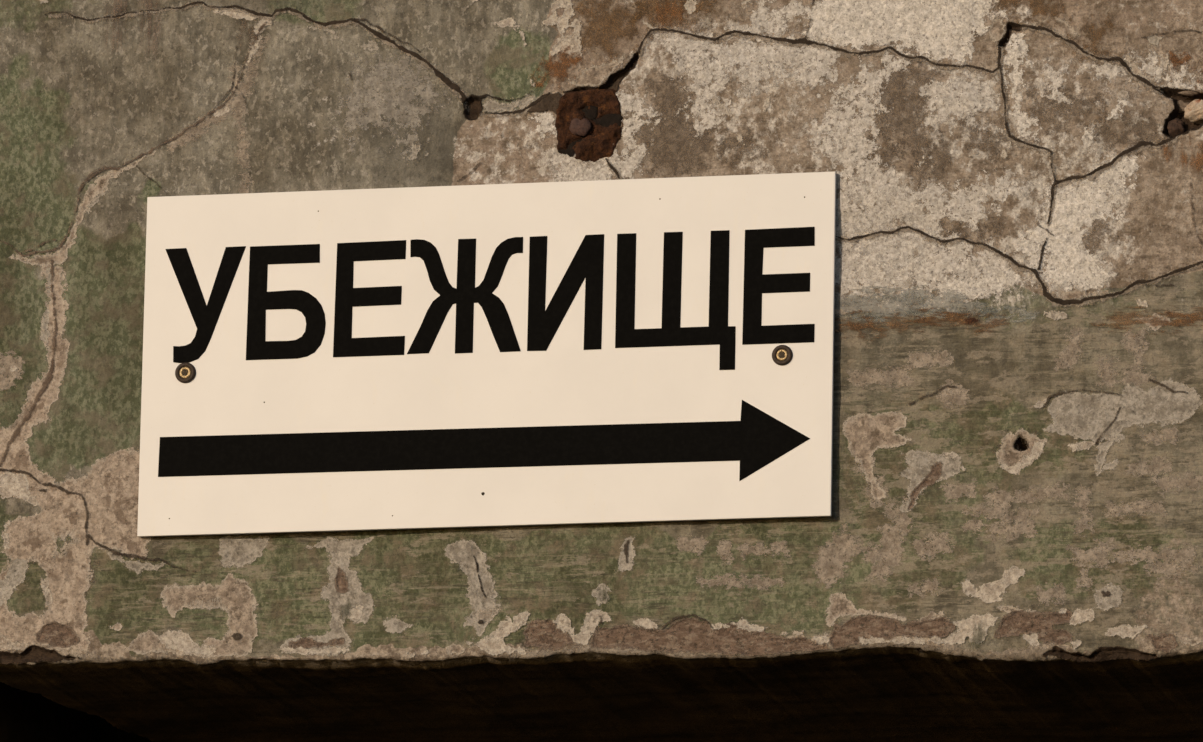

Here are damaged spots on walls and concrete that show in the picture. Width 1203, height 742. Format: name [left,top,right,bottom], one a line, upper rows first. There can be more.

peeling [541,0,637,87]
spalling [558,136,586,157]
crack [0,0,1203,307]
spalling [582,105,623,127]
spalling [1157,87,1203,138]
spalling [444,299,1203,662]